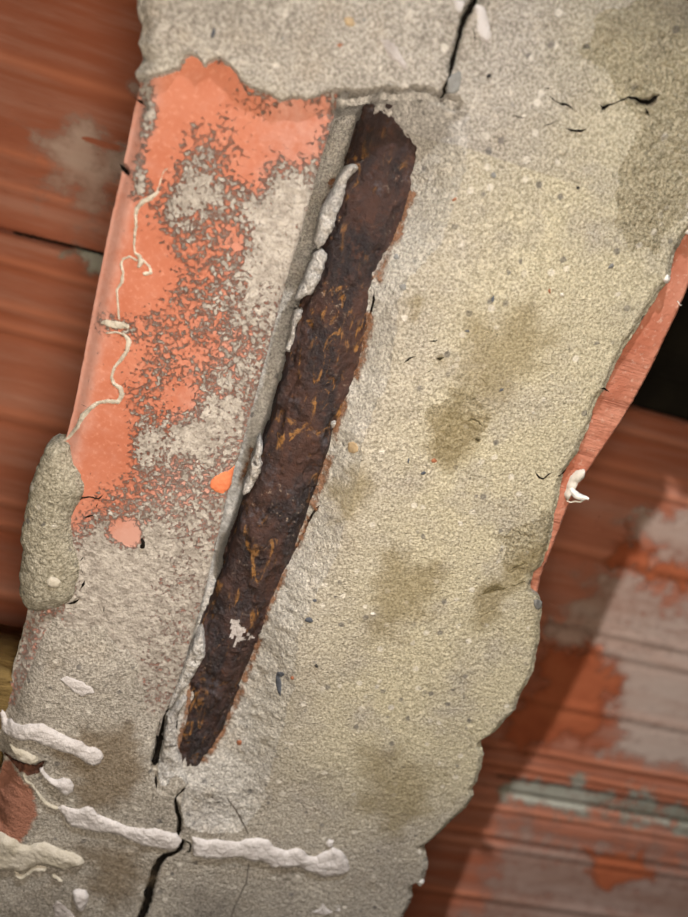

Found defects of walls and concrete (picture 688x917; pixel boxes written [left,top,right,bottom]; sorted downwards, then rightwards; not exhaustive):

crack [440,0,477,99]
corrosion [371,190,416,283]
corrosion [354,312,374,380]
spalling [158,87,470,834]
corrosion [295,455,334,549]
spalling [424,387,491,462]
crack [137,704,191,917]